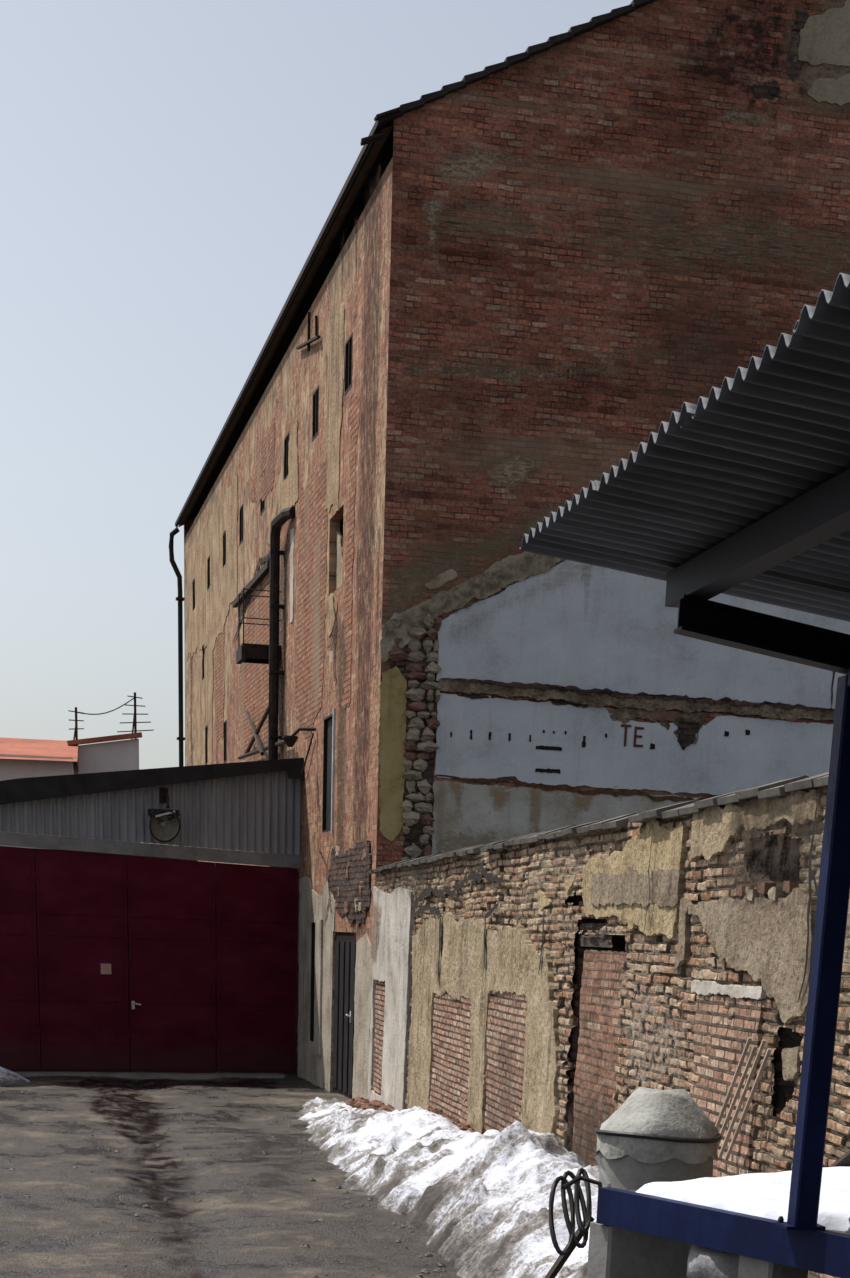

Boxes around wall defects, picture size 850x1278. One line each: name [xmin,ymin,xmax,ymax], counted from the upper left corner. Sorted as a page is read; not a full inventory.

flaking render [752,0,850,115]
spalling [328,613,452,925]
spalling [529,730,567,751]
peeling [551,700,588,708]
spalling [605,706,706,750]
flaking render [407,789,823,1152]